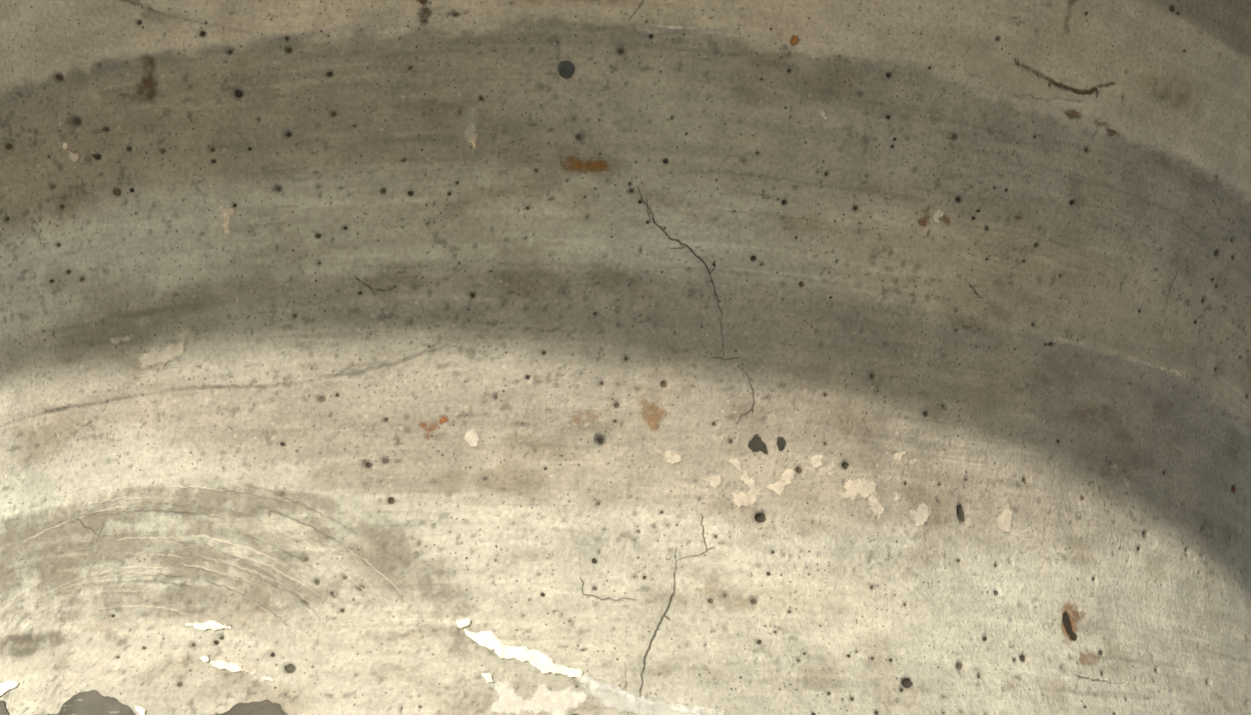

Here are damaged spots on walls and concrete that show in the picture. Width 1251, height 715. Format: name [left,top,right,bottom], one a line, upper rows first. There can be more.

crack [1017,62,1115,98]
corrosion [564,158,608,172]
crack [638,188,722,312]
crack [714,357,754,423]
spalling [748,434,786,453]
spalling [729,459,796,507]
spalling [842,479,899,517]
crack [639,513,713,698]
peeling [456,618,700,715]
peeling [0,680,18,715]
peeling [47,690,145,715]
peeling [211,699,287,715]